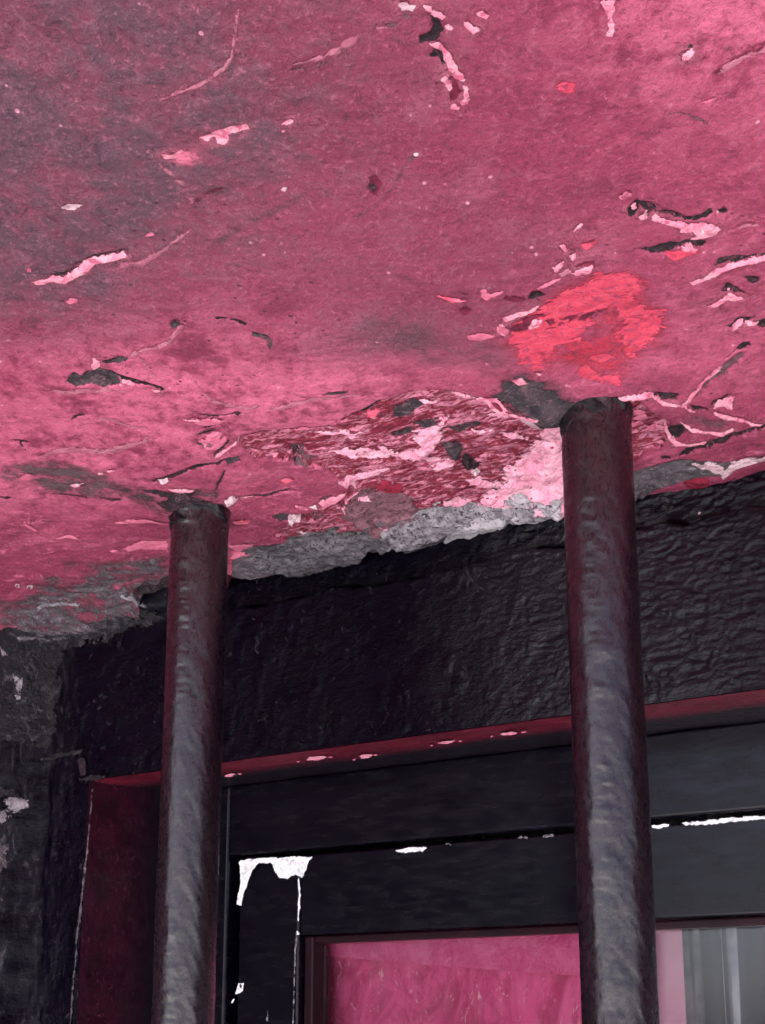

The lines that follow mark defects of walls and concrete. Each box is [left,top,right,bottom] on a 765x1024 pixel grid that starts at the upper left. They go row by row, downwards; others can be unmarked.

spalling [388,0,489,110]
peeling [200,124,249,145]
peeling [160,149,198,165]
spalling [619,191,758,240]
peeling [27,248,128,285]
peeling [437,223,765,463]
crack [662,424,765,459]
spalling [183,389,564,540]
peeling [109,540,169,553]
peeling [228,544,255,559]
peeling [237,856,312,1024]